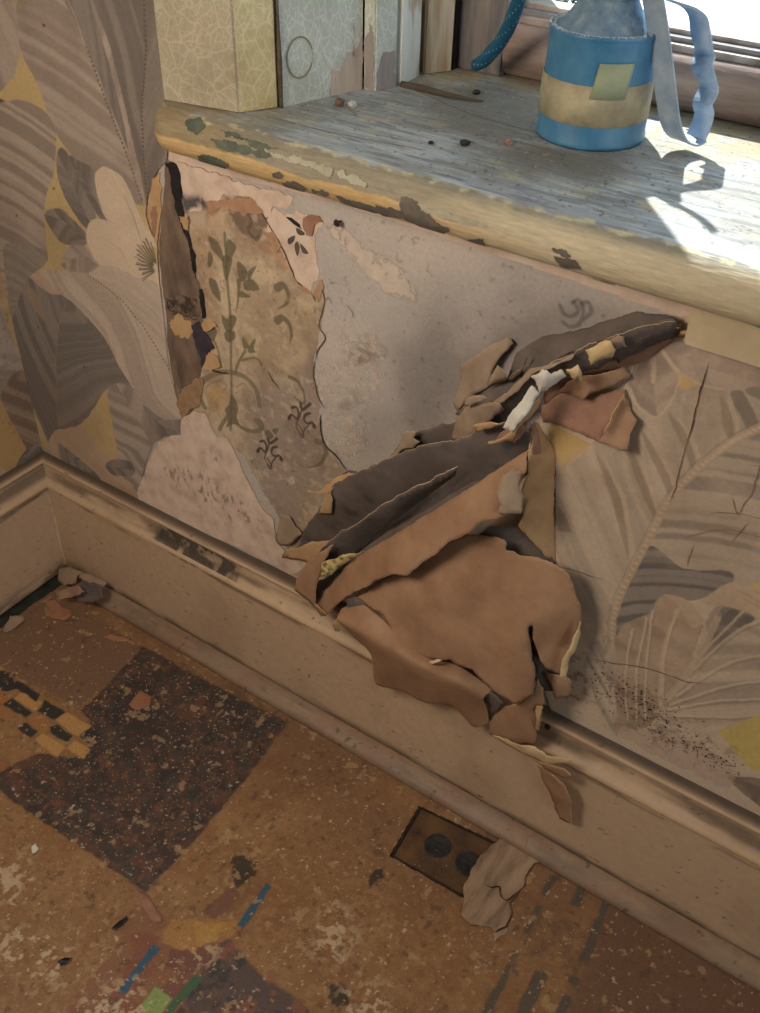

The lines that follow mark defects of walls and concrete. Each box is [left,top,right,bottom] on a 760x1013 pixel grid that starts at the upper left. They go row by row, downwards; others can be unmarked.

peeling [330,24,396,96]
peeling [185,117,206,135]
flaking render [177,130,487,303]
peeling [552,247,581,270]
peeling [201,320,217,332]
peeling [203,352,221,371]
crack [669,363,709,502]
flaking render [137,411,307,576]
crack [687,465,760,565]